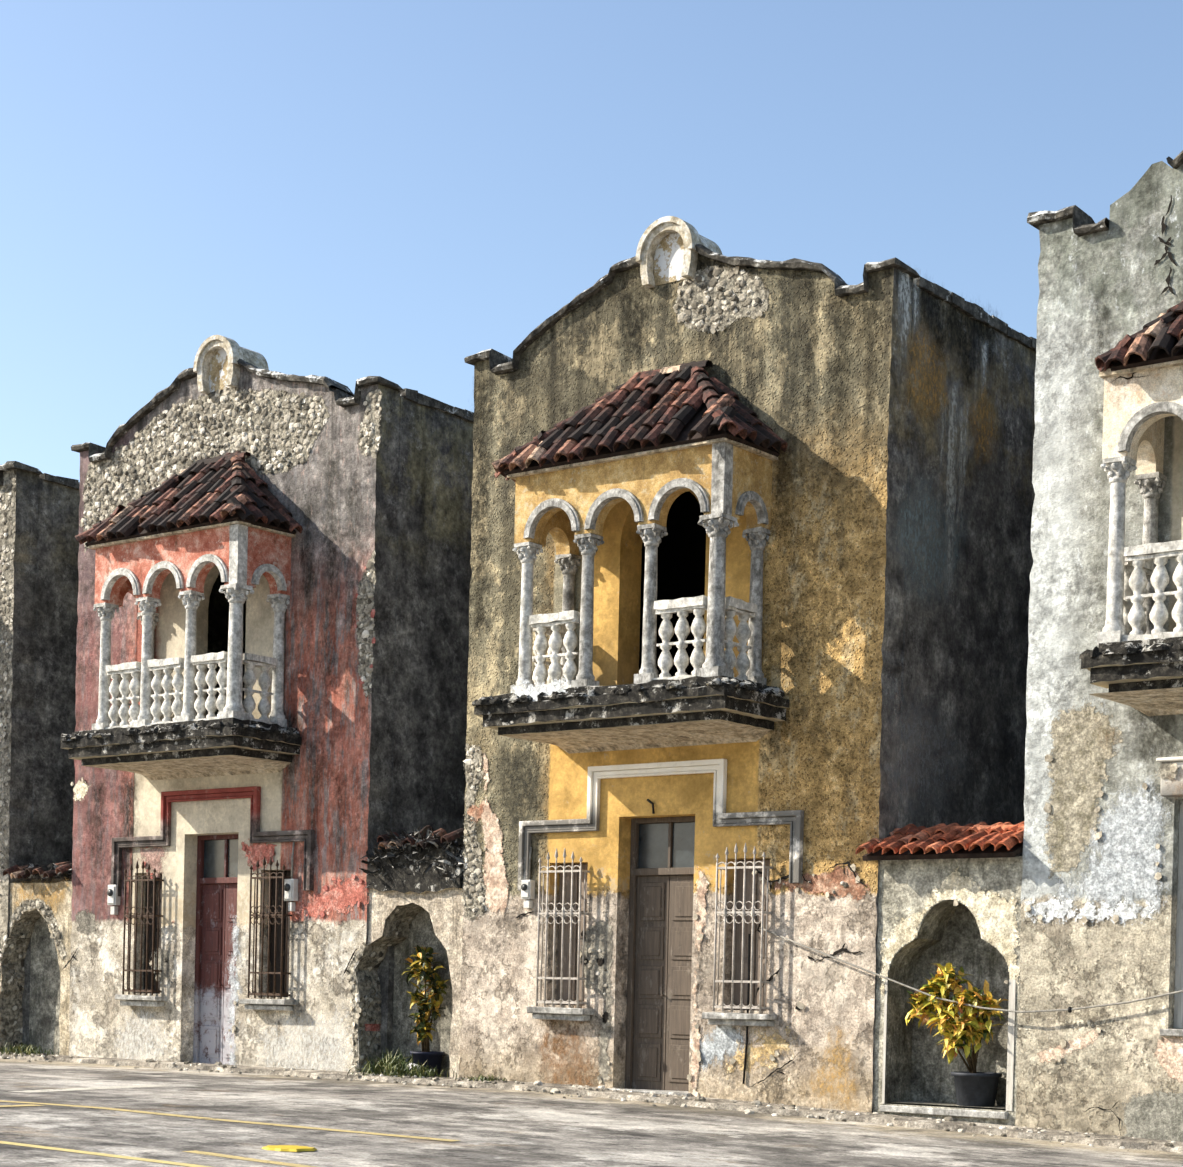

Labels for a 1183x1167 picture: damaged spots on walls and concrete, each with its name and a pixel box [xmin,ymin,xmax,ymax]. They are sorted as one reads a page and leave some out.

crack [1154,195,1177,295]
spalling [673,265,769,334]
leakage [896,274,995,592]
spalling [354,548,376,697]
peeling [292,871,369,922]
spalling [460,743,509,921]
peeling [879,703,1178,996]
crack [755,968,781,998]
crack [807,944,863,962]